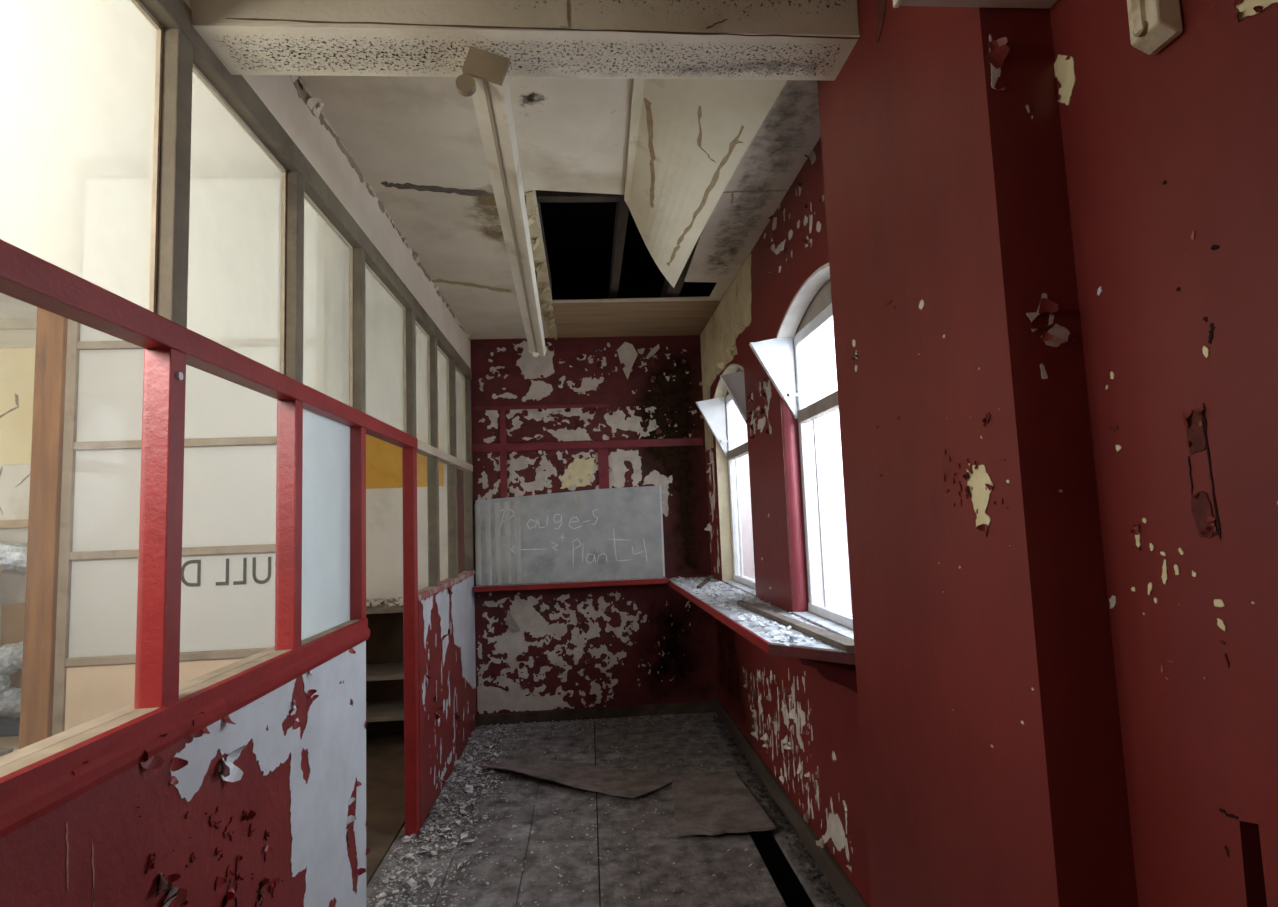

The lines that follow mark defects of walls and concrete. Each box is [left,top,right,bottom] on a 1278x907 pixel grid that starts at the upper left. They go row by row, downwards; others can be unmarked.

leakage [215,35,843,78]
peeling [1054,54,1076,105]
peeling [1232,0,1278,22]
crack [644,98,655,208]
crack [667,106,787,266]
peeling [478,190,752,574]
peeling [746,377,772,439]
peeling [963,463,1010,532]
spalling [1130,518,1197,615]
peeling [421,575,691,792]
peeling [140,641,370,907]
peeling [743,668,853,873]